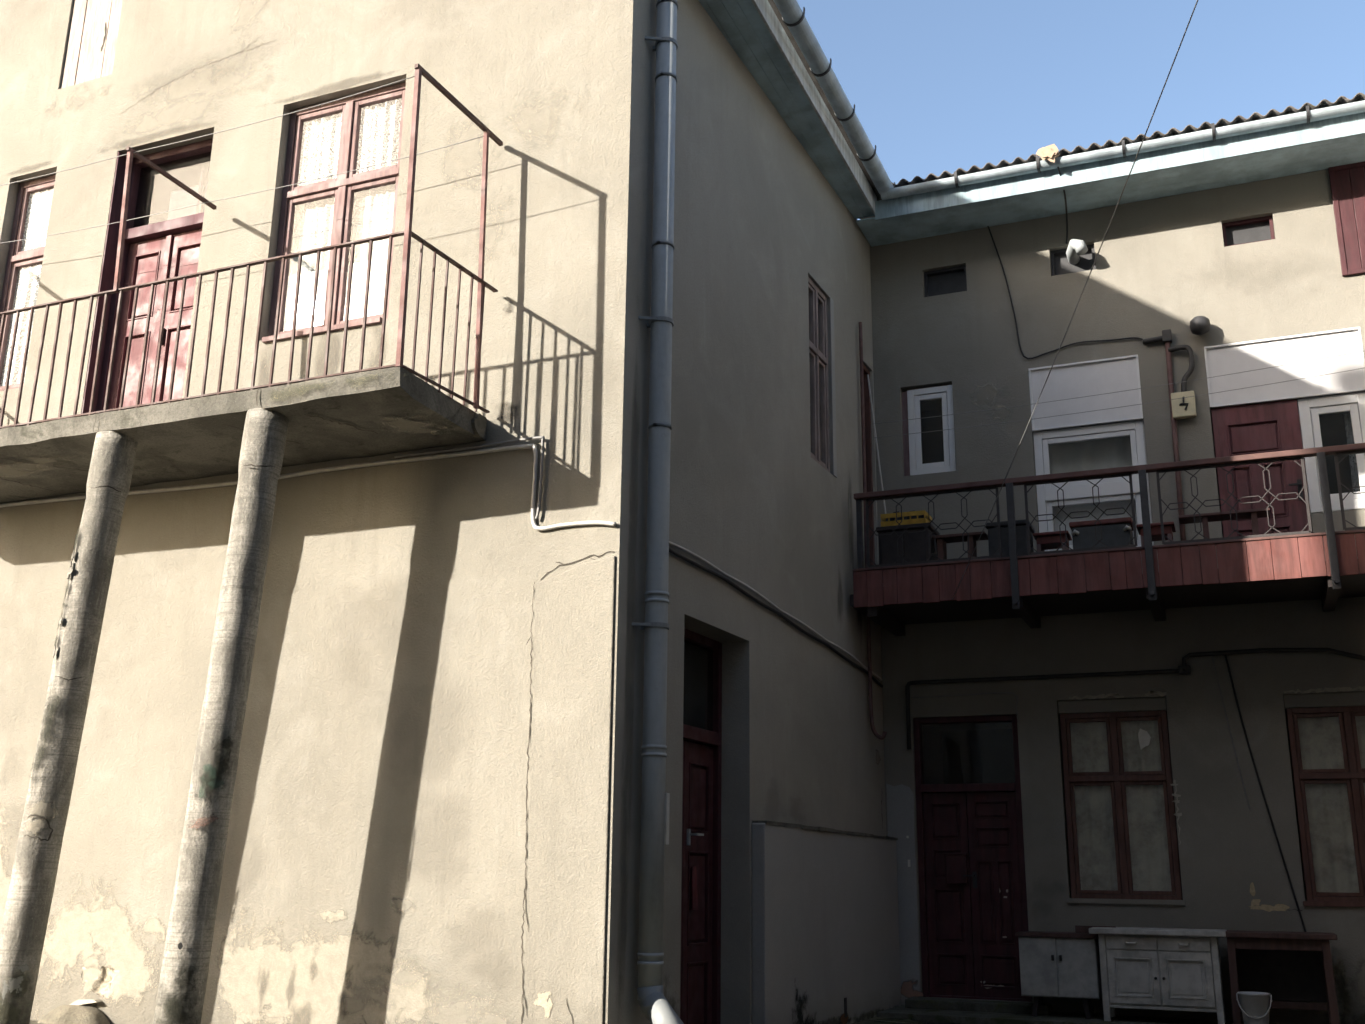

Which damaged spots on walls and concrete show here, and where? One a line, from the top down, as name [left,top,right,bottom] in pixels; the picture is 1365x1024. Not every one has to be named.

peeling [24,800,56,841]
water stain [32,696,60,782]
water stain [200,736,233,802]
crack [521,551,614,1024]
flaking render [43,880,166,1005]
flaking render [218,909,439,1024]